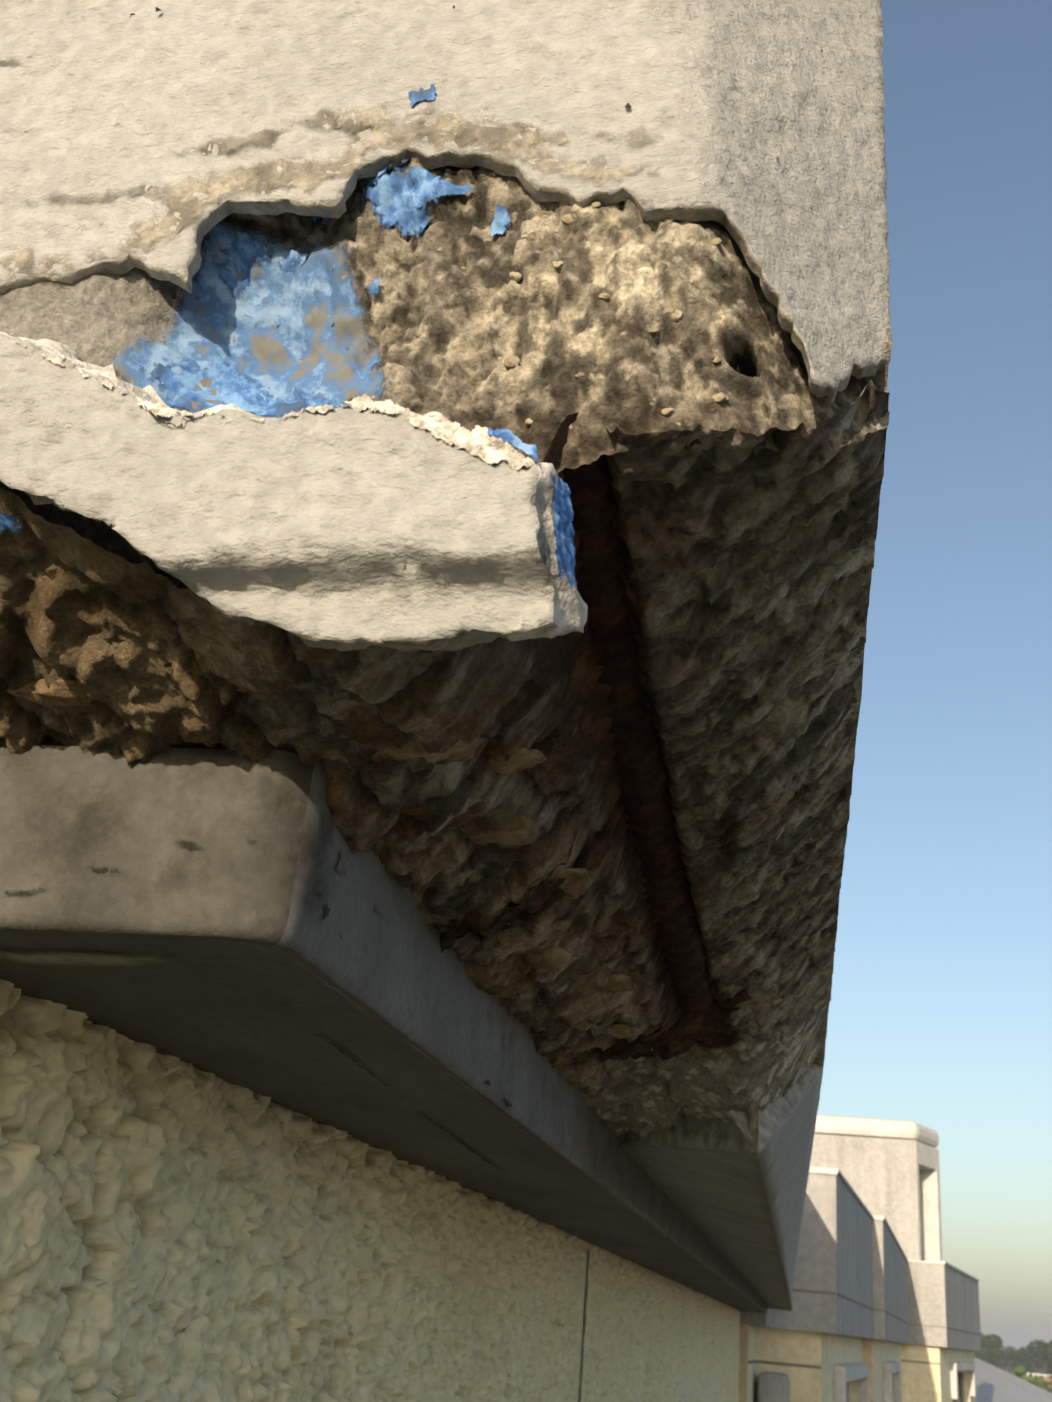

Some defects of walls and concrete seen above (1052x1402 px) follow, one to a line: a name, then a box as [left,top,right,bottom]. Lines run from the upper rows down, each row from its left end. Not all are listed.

peeling [483,122,568,148]
spalling [0,158,890,599]
peeling [371,732,547,775]
rust [532,454,752,1063]
peeling [478,815,537,847]
peeling [549,868,591,897]
rust [500,888,564,932]
crack [579,1247,590,1402]